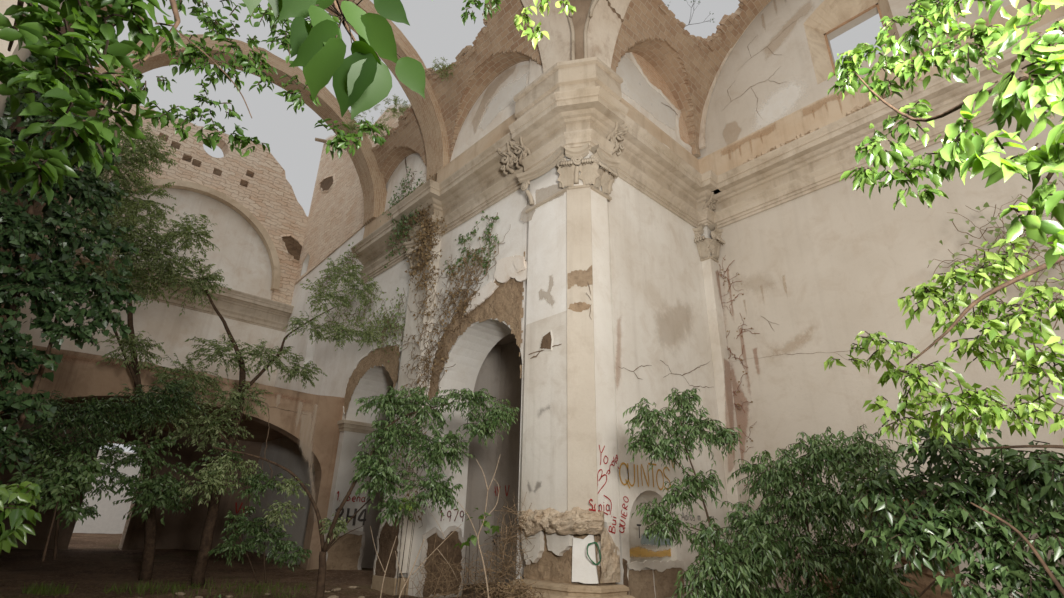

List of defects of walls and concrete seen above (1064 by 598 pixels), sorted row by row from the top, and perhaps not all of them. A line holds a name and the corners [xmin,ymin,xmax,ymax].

crack [727,20,797,117]
spalling [426,252,528,406]
peeling [539,277,554,305]
spalling [539,329,554,351]
spalling [568,302,590,312]
spalling [567,265,593,289]
crack [621,316,872,388]
spalling [518,506,686,598]